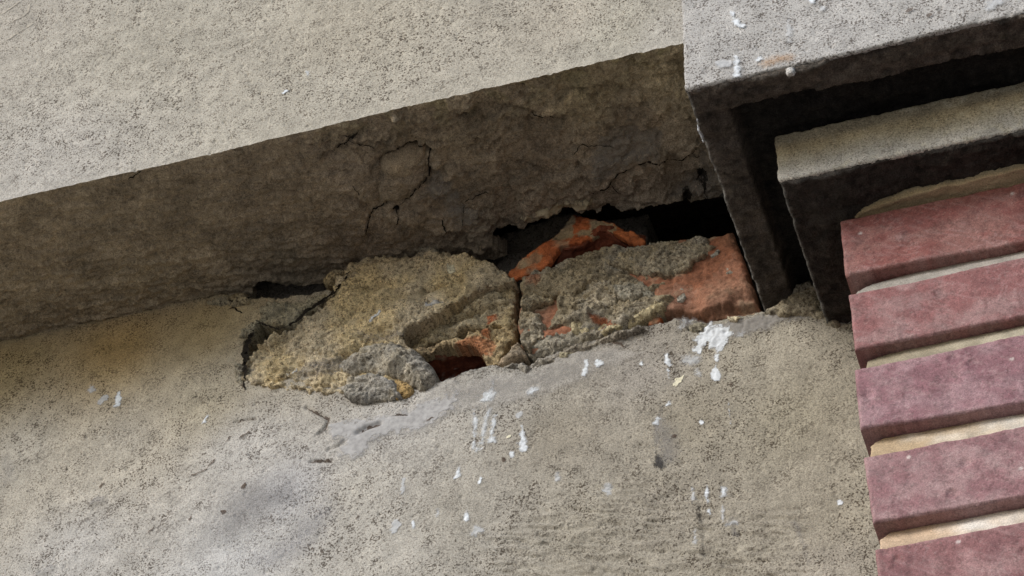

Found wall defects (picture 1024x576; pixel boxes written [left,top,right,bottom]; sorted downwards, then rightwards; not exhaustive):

crack [337,132,432,237]
flaking render [481,198,765,364]
flaking render [207,281,333,350]
damp [581,359,604,376]
damp [664,322,744,386]
damp [472,390,527,457]
damp [691,487,737,525]